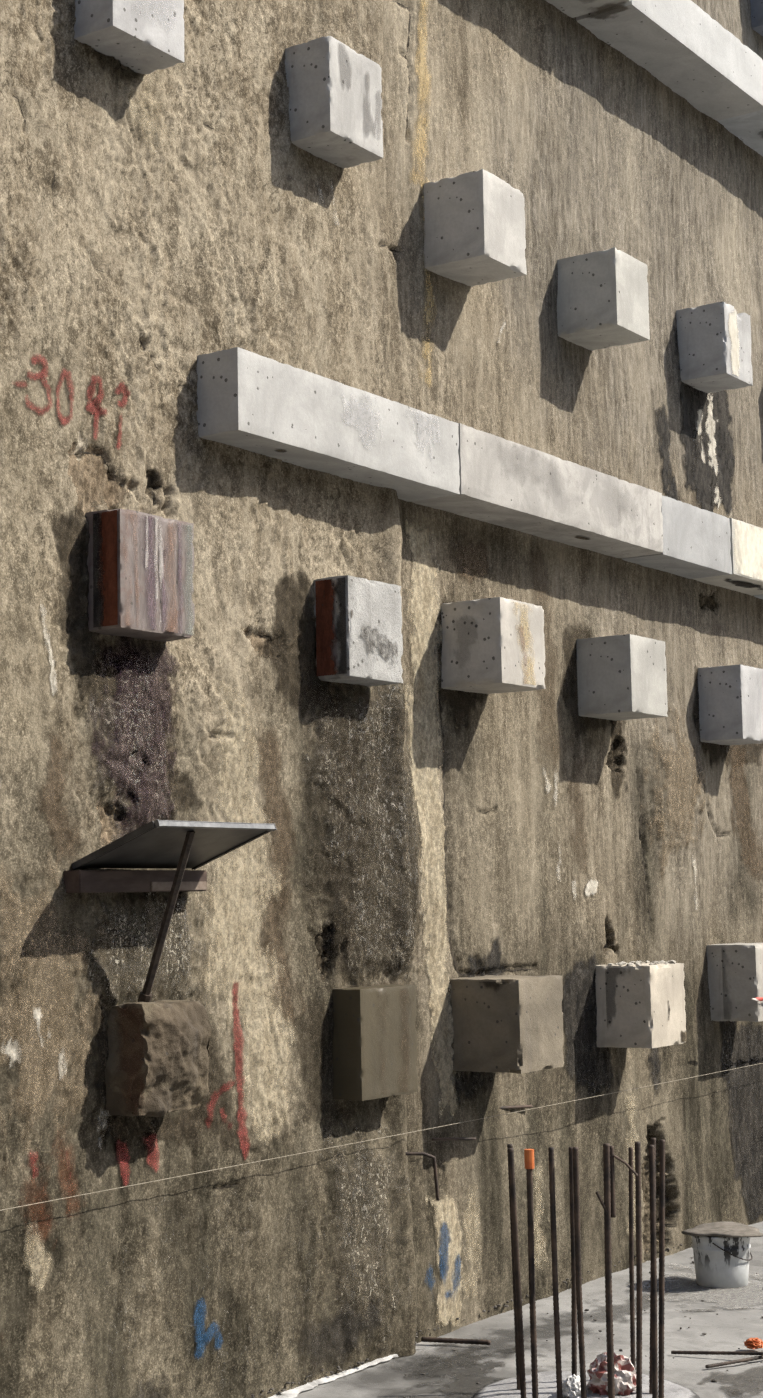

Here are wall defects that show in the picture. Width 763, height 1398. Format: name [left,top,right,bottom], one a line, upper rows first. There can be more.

corrosion [100,510,118,627]
corrosion [315,579,337,676]
leakage [42,502,295,1150]
leakage [262,519,493,1115]
leakage [468,938,506,989]
leakage [6,1041,18,1066]